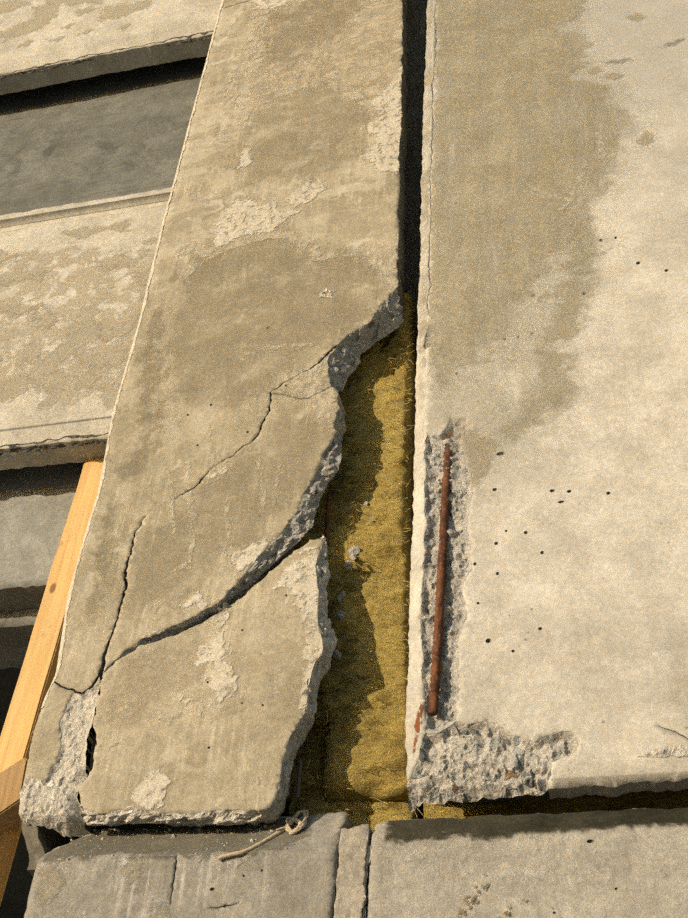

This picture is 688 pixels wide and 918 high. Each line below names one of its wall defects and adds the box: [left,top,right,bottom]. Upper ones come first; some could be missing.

water stain [418,0,621,436]
water stain [637,132,653,145]
spalling [19,535,338,838]
crack [54,430,342,695]
crack [232,347,336,457]
spalling [289,288,404,419]
water stain [461,430,497,483]
spalling [407,418,580,817]